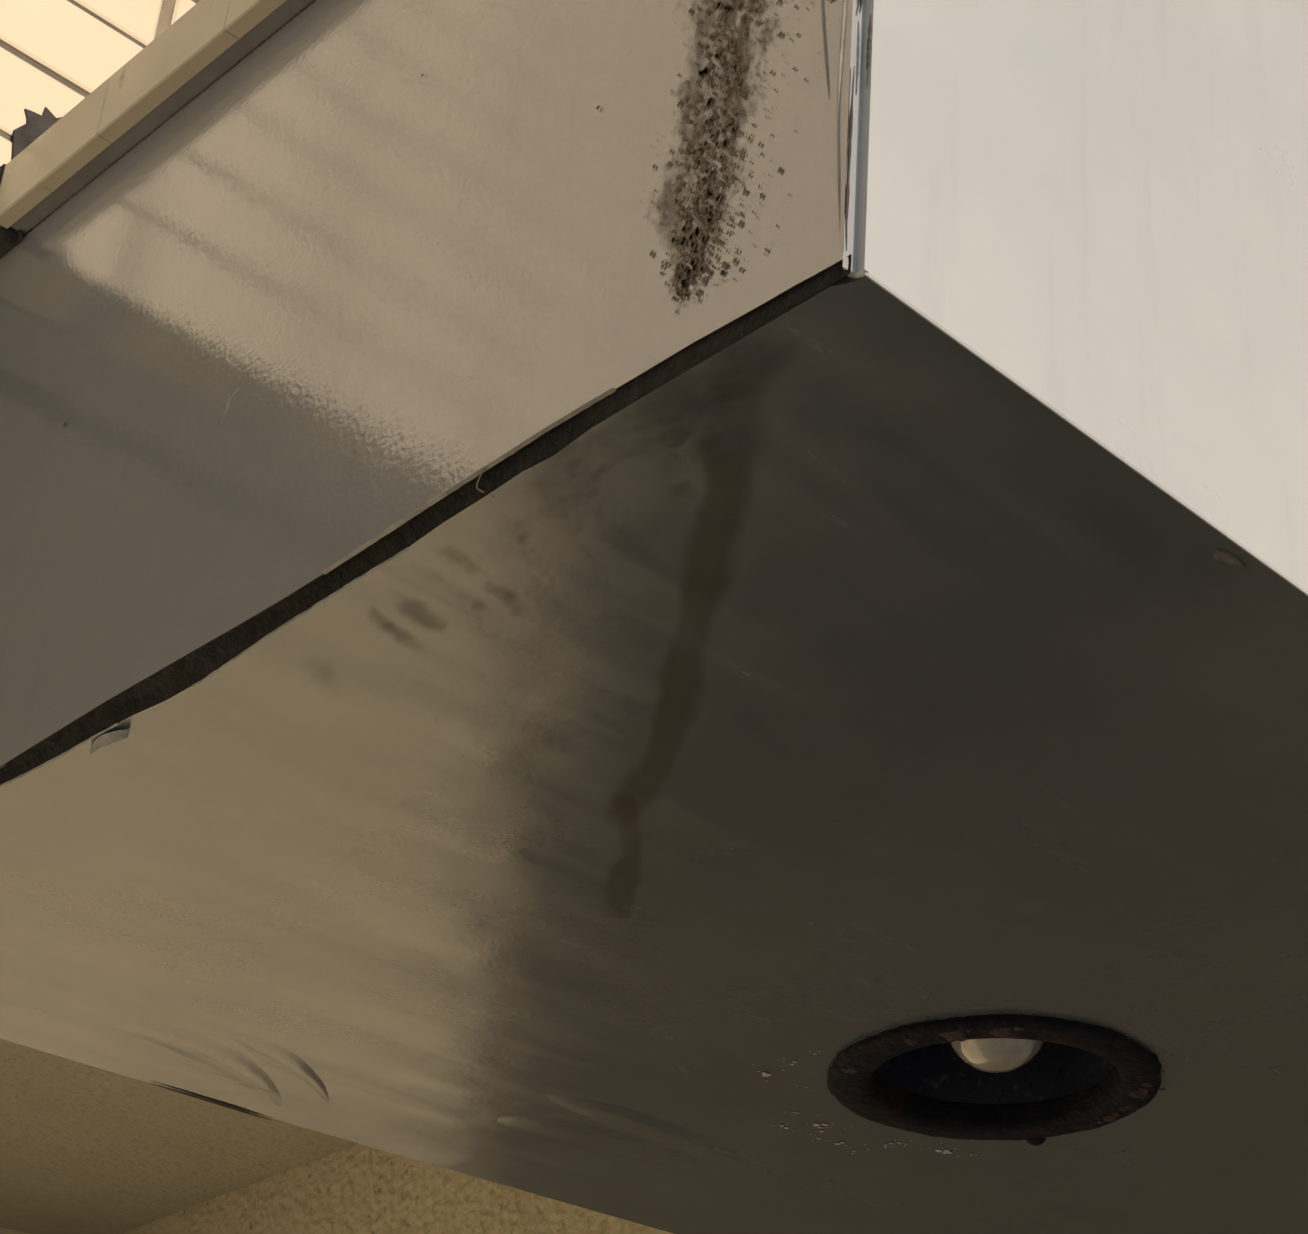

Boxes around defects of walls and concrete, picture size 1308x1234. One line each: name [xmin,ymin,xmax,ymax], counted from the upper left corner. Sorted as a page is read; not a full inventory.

mould [640,0,819,313]